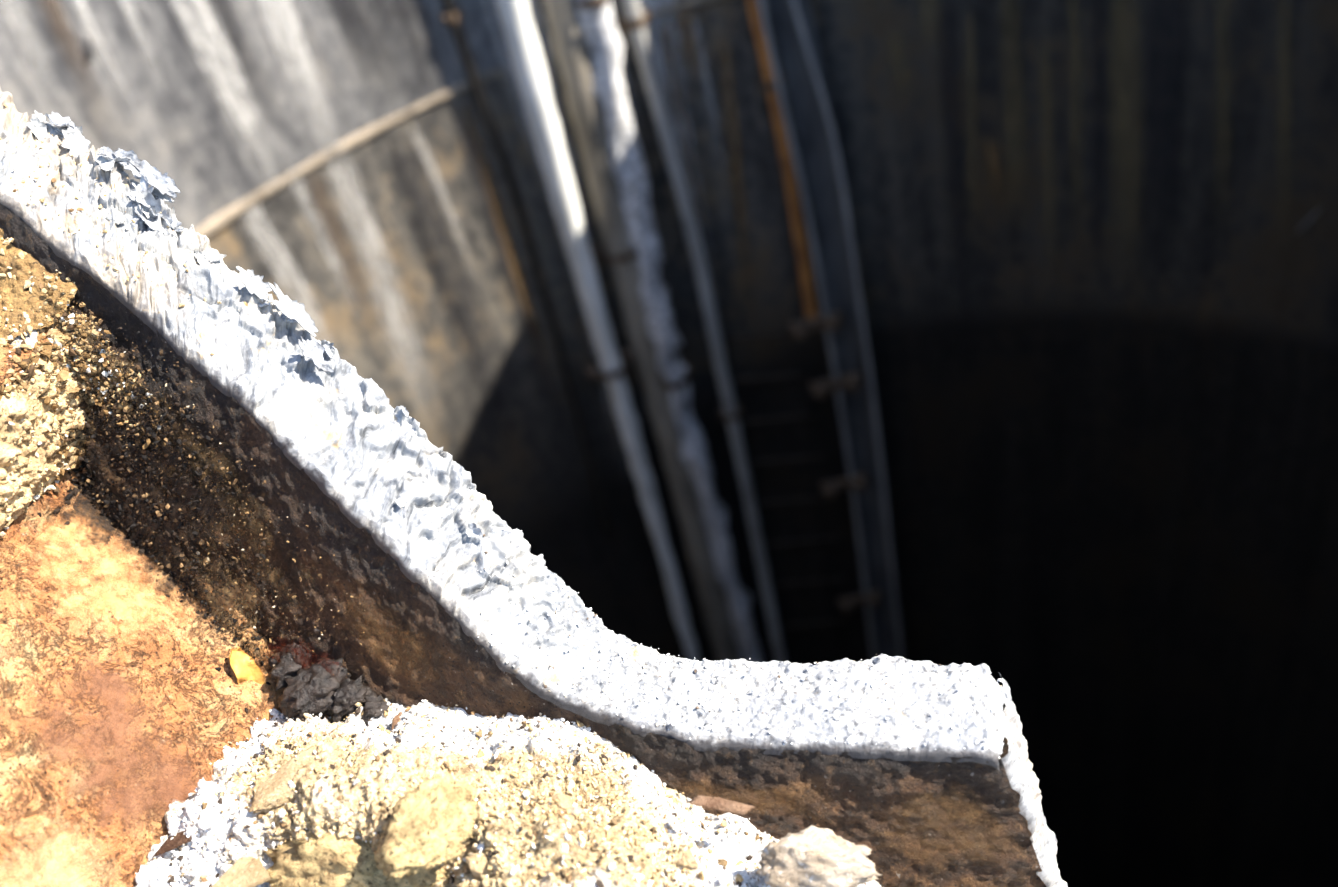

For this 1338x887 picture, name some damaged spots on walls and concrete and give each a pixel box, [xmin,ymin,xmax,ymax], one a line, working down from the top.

rust [44,514,170,631]
rust [44,663,198,825]